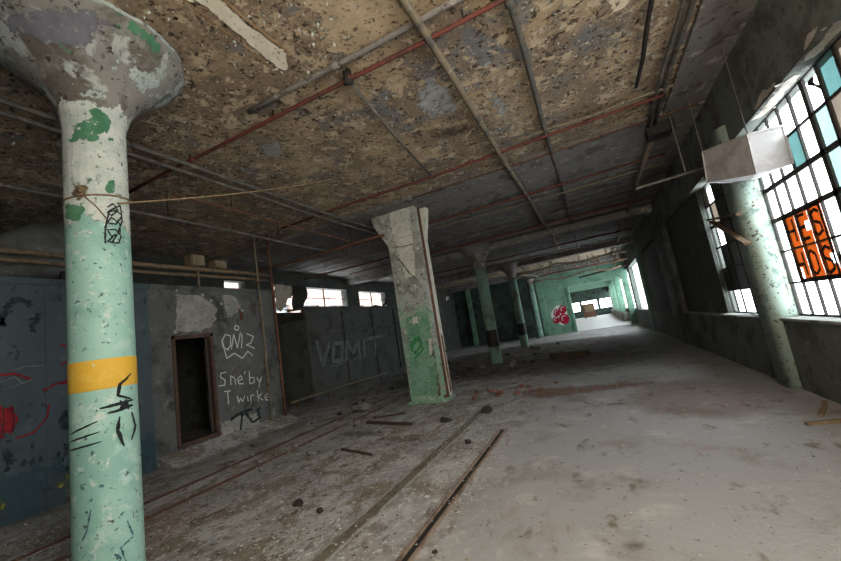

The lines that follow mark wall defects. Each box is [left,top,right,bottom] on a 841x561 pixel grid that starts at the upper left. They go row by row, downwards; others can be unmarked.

peeling [0,0,683,280]
flaking render [173,289,245,334]
peeling [402,311,441,399]